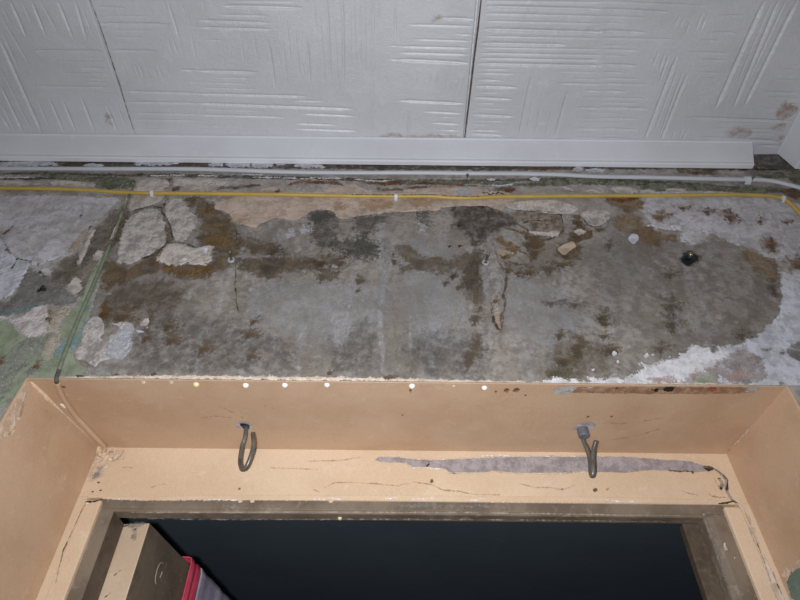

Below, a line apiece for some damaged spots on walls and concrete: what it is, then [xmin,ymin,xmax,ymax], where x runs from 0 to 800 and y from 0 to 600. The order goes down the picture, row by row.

crack [2,226,46,277]
crack [134,203,194,258]
damp [236,210,462,325]
flaking render [0,171,800,439]
damp [449,206,540,247]
damp [541,272,800,385]